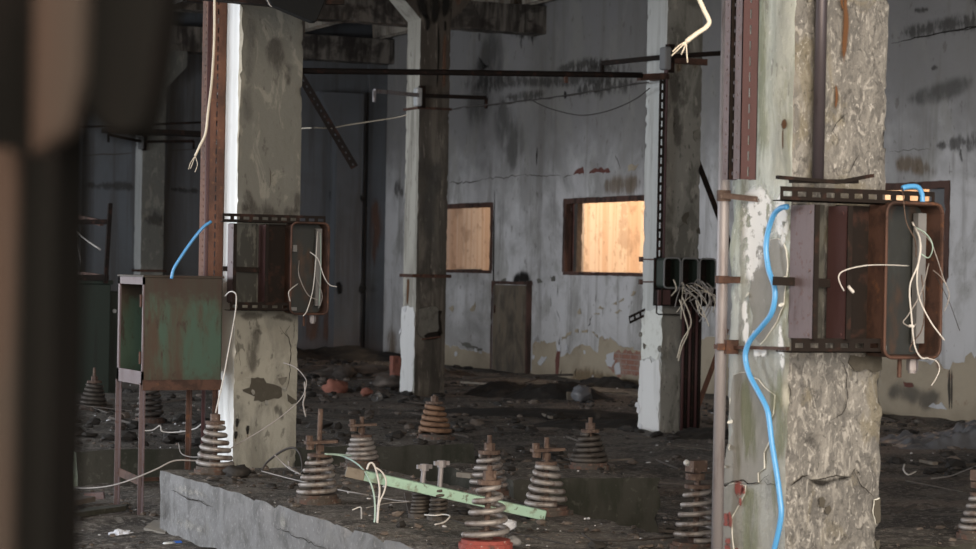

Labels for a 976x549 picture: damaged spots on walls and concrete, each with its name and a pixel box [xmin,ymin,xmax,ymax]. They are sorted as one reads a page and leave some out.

rust [840,0,849,59]
peeling [745,238,789,345]
flaking render [242,377,297,405]
flaking render [530,308,663,432]
flaking render [848,352,976,421]
crack [725,469,874,497]